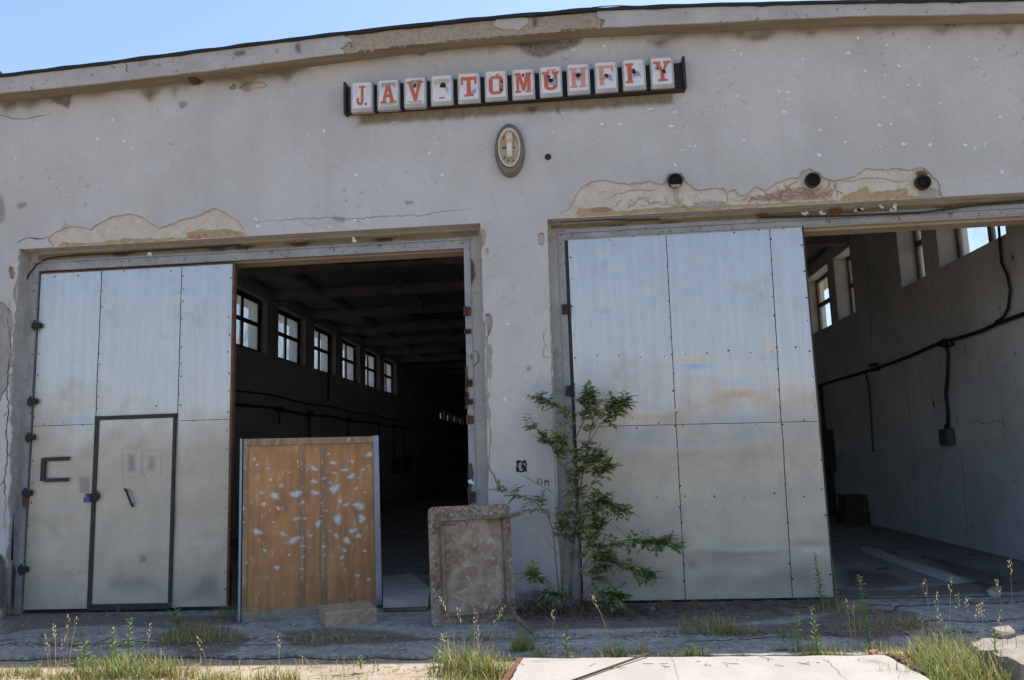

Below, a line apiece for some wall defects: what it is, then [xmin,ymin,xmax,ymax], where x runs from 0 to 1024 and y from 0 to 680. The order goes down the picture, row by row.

peeling [561,164,942,218]
peeling [48,208,260,256]
crack [0,301,11,521]